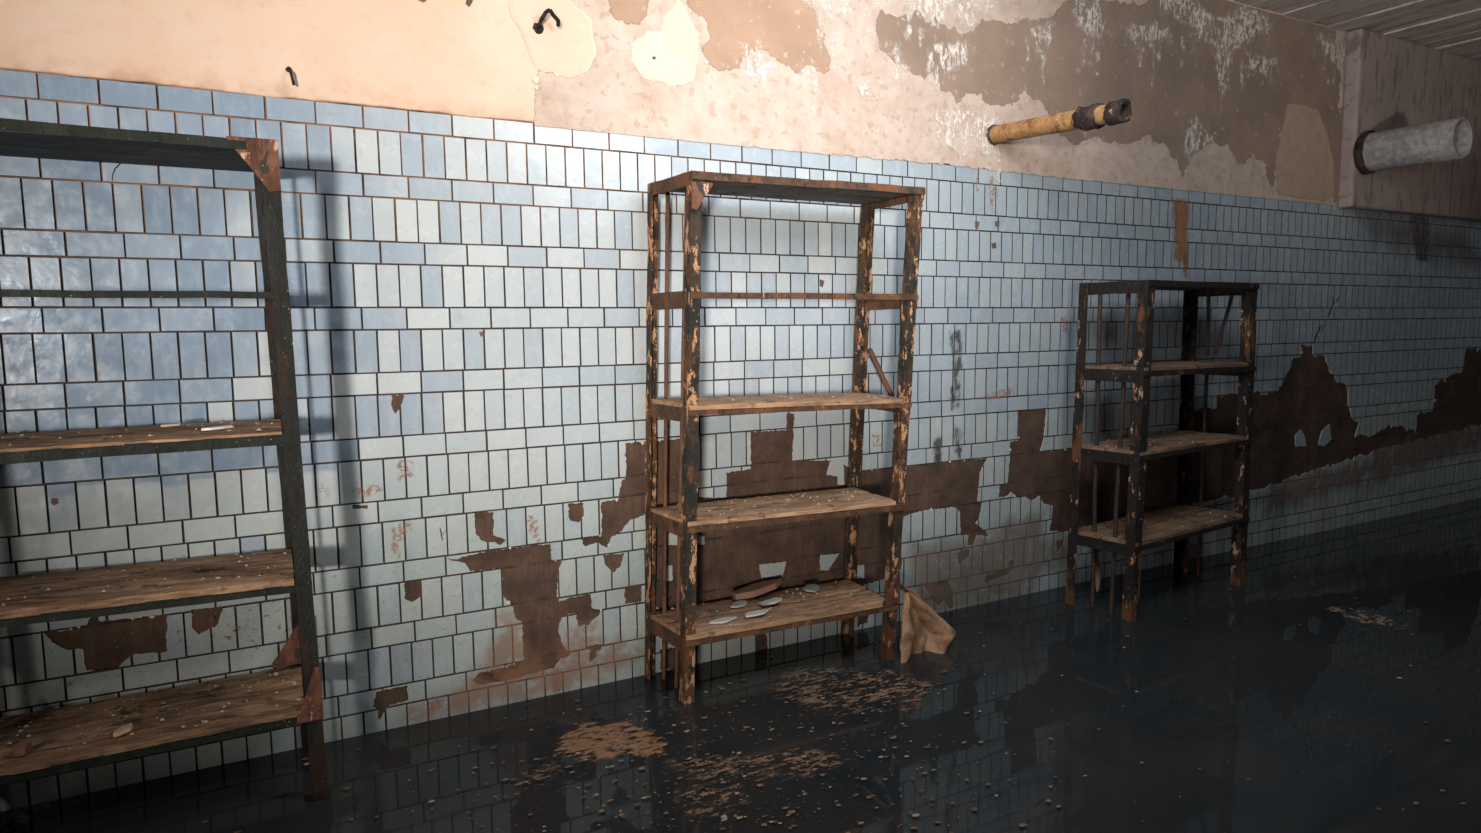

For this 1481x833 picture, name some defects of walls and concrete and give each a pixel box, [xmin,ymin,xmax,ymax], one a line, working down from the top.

peeling [509,0,1337,205]
corrosion [1174,201,1188,276]
peeling [566,343,1481,651]
peeling [41,613,169,673]
peeling [188,604,225,634]
peeling [440,510,604,685]
peeling [373,683,408,719]